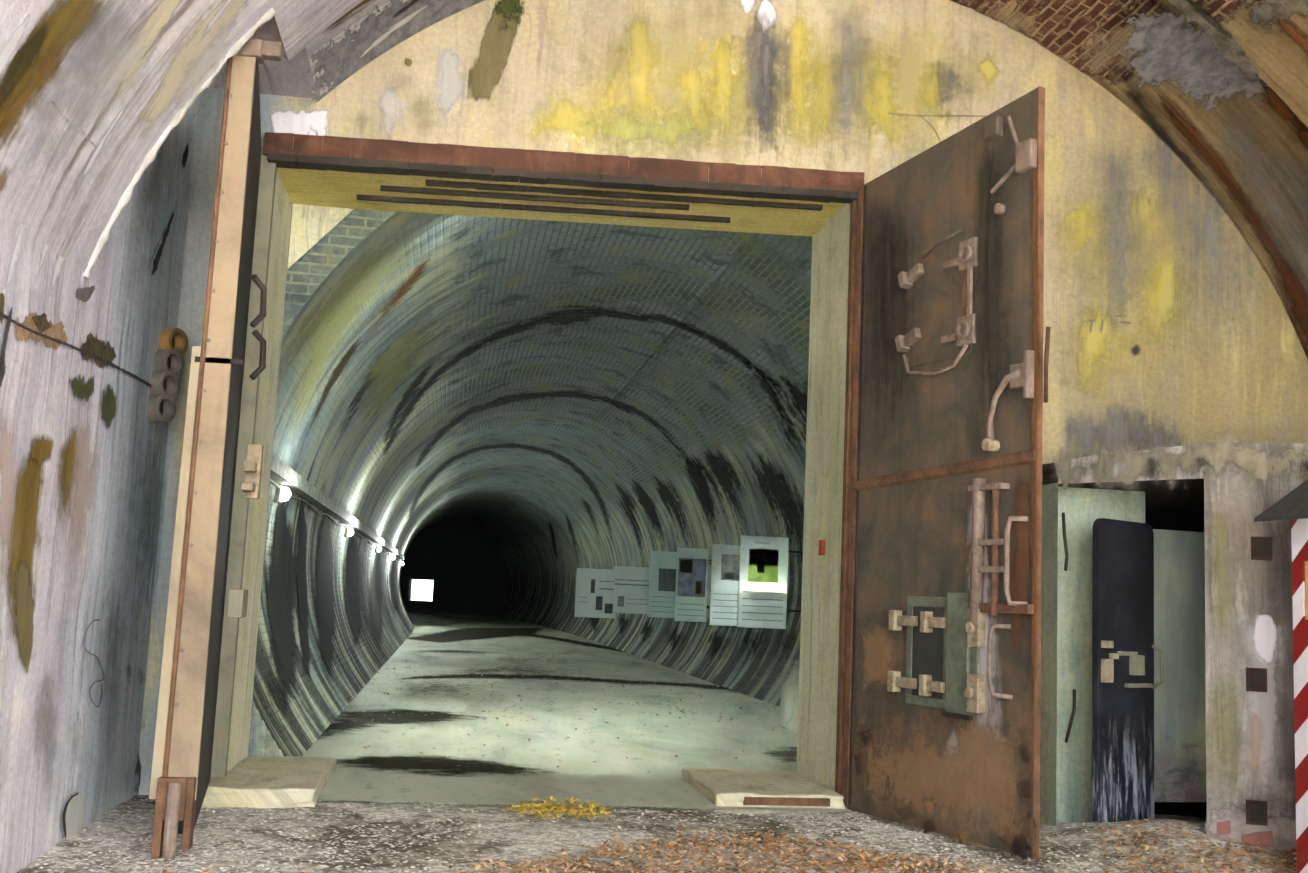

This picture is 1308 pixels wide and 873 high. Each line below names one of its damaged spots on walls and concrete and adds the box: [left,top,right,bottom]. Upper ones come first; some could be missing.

leakage [0,0,181,181]
leakage [139,0,247,135]
spalling [271,0,485,150]
leakage [629,20,656,112]
leakage [676,0,897,139]
leakage [921,71,958,107]
flaking render [950,0,1308,111]
corrosion [1276,19,1308,55]
corrosion [1128,81,1308,359]
spalling [0,292,152,387]
peeling [76,272,95,311]
corrosion [860,619,1047,849]